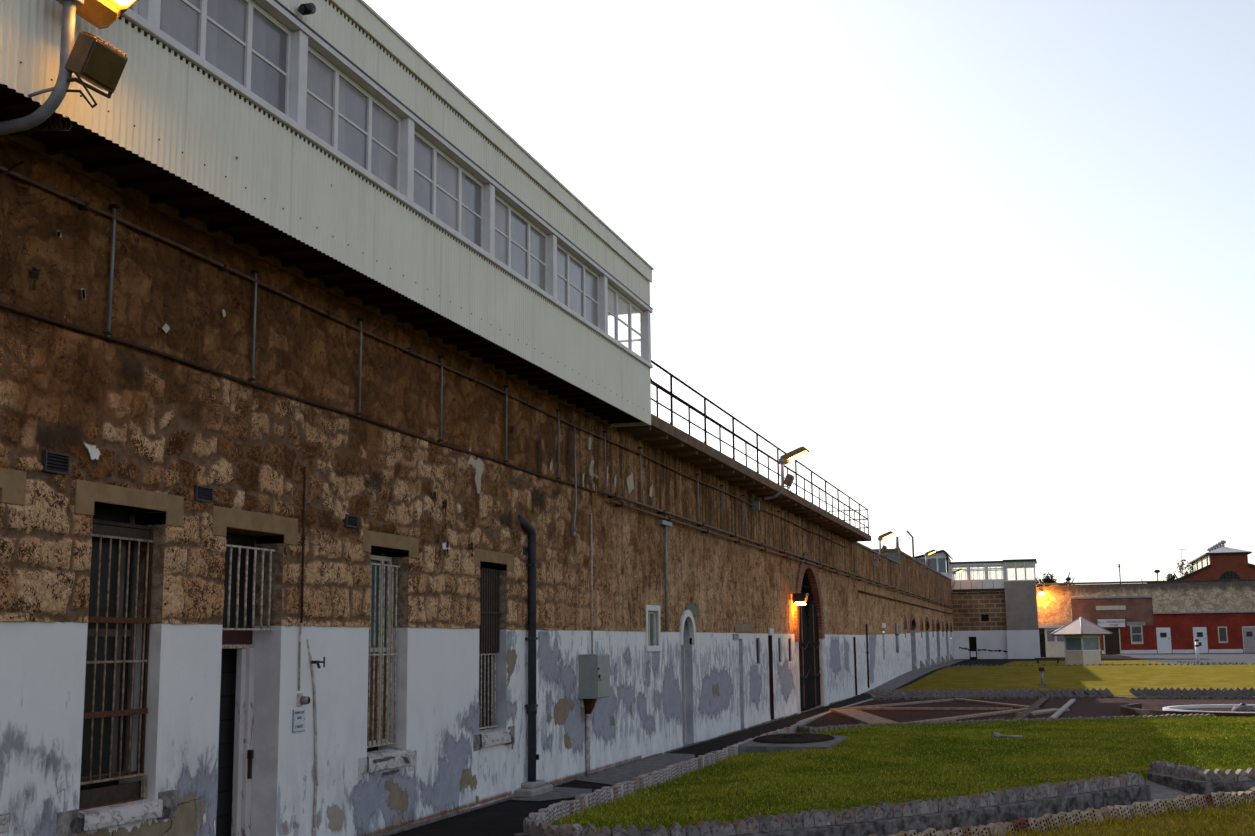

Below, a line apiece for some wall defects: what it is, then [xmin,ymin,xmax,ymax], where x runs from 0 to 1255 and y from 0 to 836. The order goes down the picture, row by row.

peeling [537,632,682,753]
peeling [698,666,733,718]
peeling [750,663,762,711]
peeling [777,659,794,704]
flaking render [32,760,218,836]
peeling [350,703,480,836]